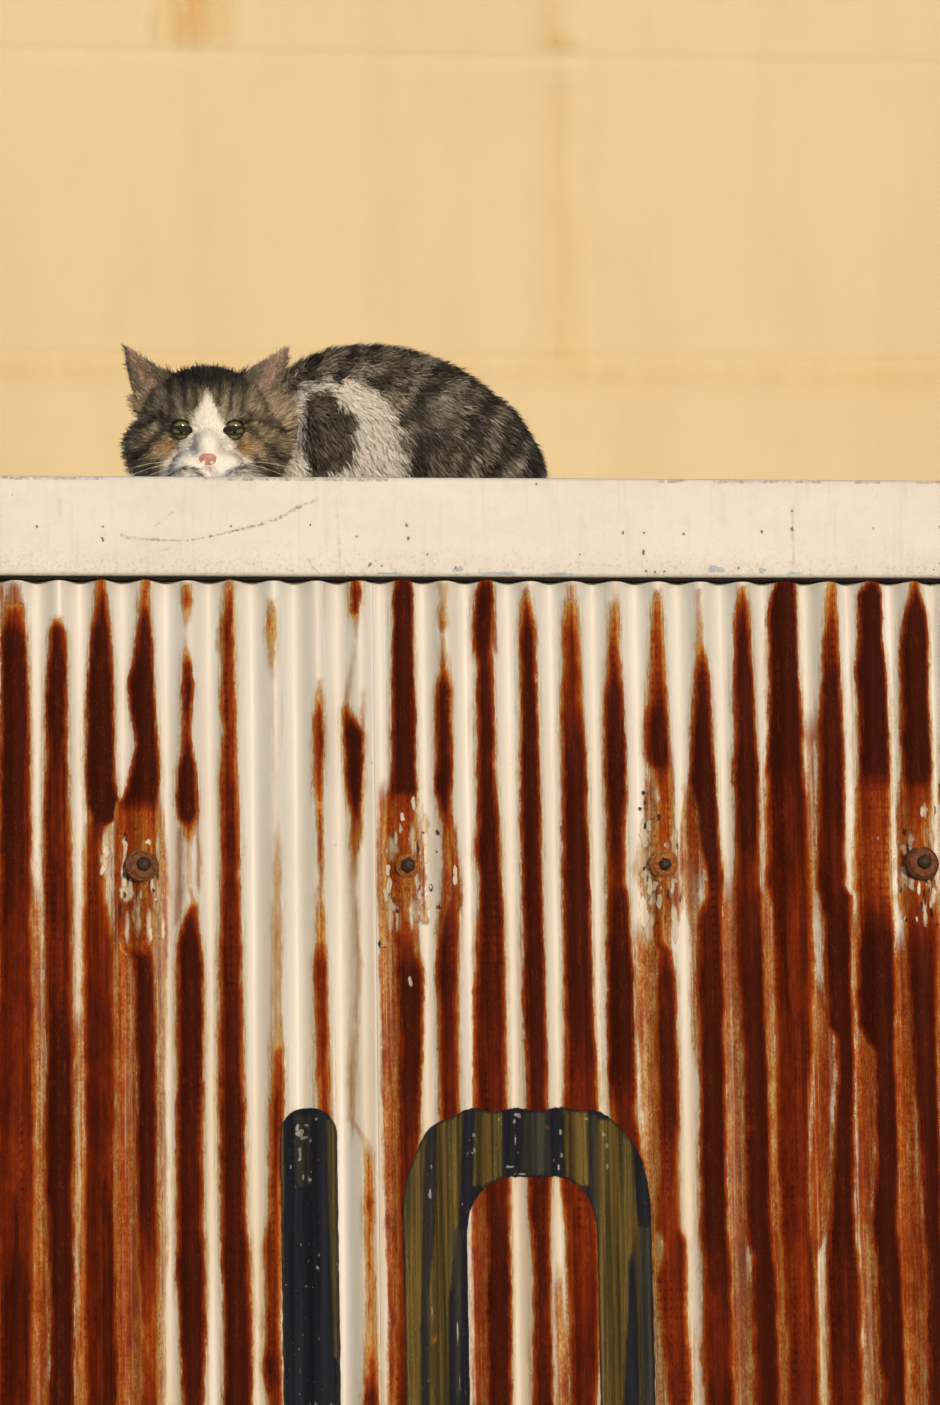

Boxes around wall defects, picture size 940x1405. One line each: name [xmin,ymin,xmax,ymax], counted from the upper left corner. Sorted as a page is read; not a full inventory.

peeling [100,828,165,941]
peeling [378,797,441,948]
peeling [639,789,681,943]
corrosion [0,579,285,1405]
corrosion [311,567,940,1405]